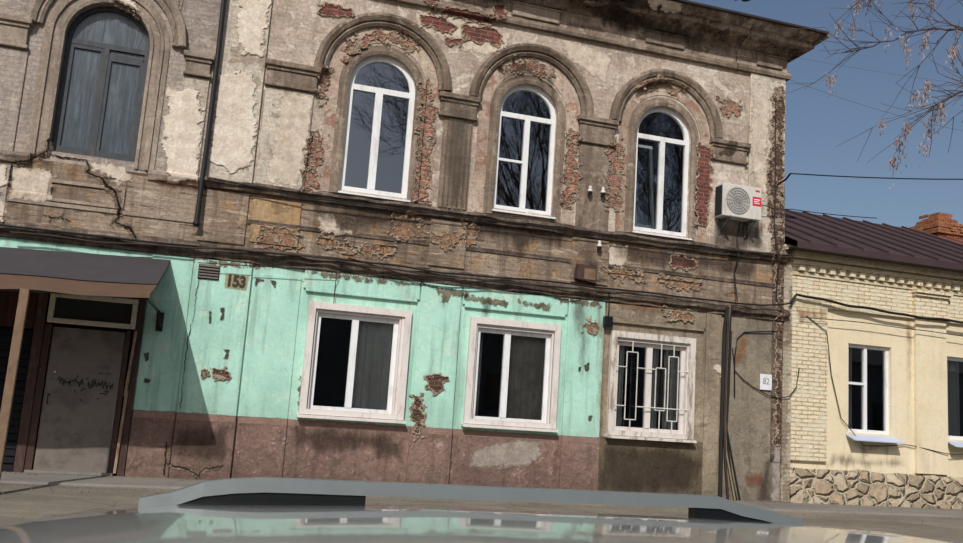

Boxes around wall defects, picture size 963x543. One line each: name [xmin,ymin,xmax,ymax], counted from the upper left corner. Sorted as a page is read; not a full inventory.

crack [112,0,142,20]
peeling [235,0,272,57]
peeling [160,70,258,185]
peeling [266,0,556,191]
peeling [0,165,54,222]
crack [0,138,137,237]
spalling [254,79,480,260]
spalling [716,86,789,501]
peeling [200,349,232,383]
spalling [409,373,449,441]
leakage [298,430,397,453]
leakage [603,449,699,492]